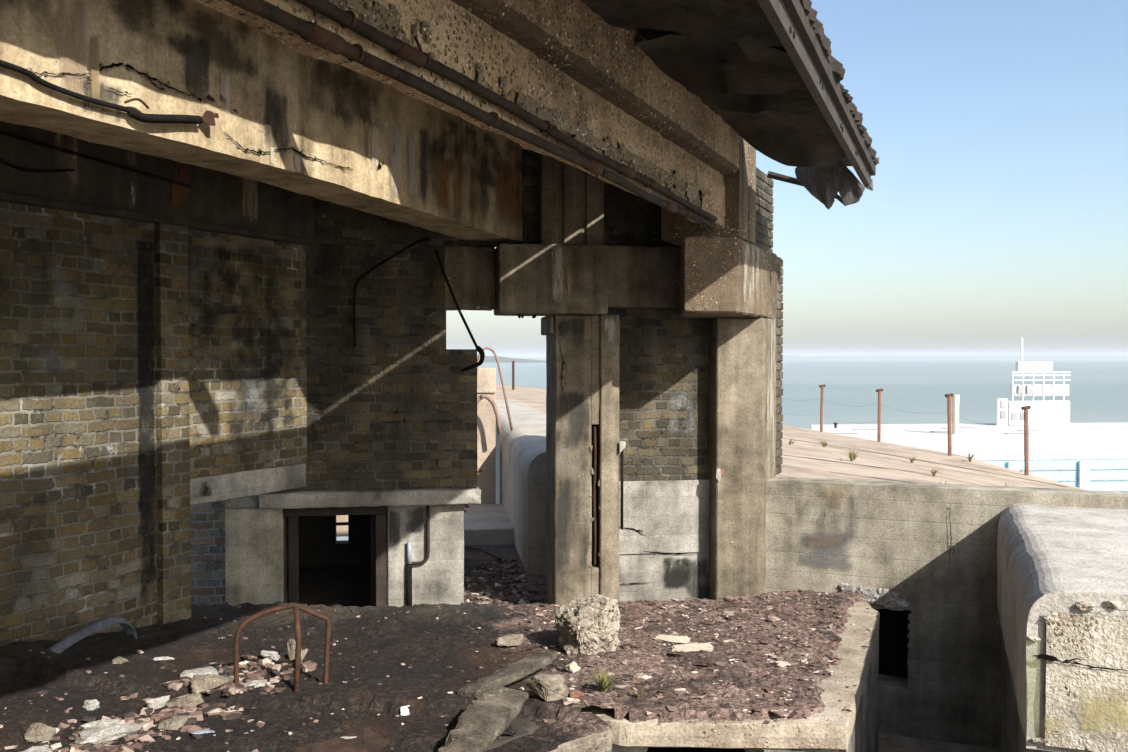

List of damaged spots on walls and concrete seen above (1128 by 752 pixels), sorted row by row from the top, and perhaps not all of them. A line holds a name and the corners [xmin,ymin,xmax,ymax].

leakage [56,0,120,113]
crack [27,62,208,103]
leakage [115,0,155,31]
leakage [167,0,257,107]
leakage [266,89,300,170]
crack [221,129,355,175]
leakage [315,61,522,214]
leakage [137,241,155,597]
crack [1032,654,1127,671]